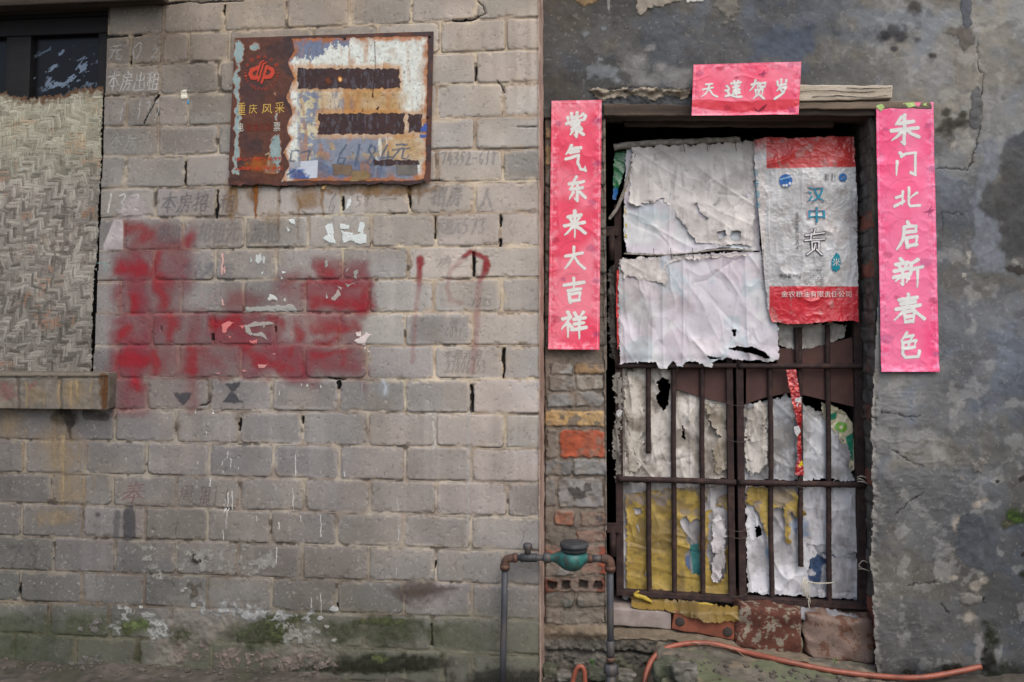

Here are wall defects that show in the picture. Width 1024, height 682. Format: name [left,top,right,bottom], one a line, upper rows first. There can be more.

peeling [576,0,610,11]
peeling [636,0,740,25]
flaking render [591,87,691,101]
crack [937,46,984,171]
water stain [962,138,1024,277]
rust [100,373,108,408]